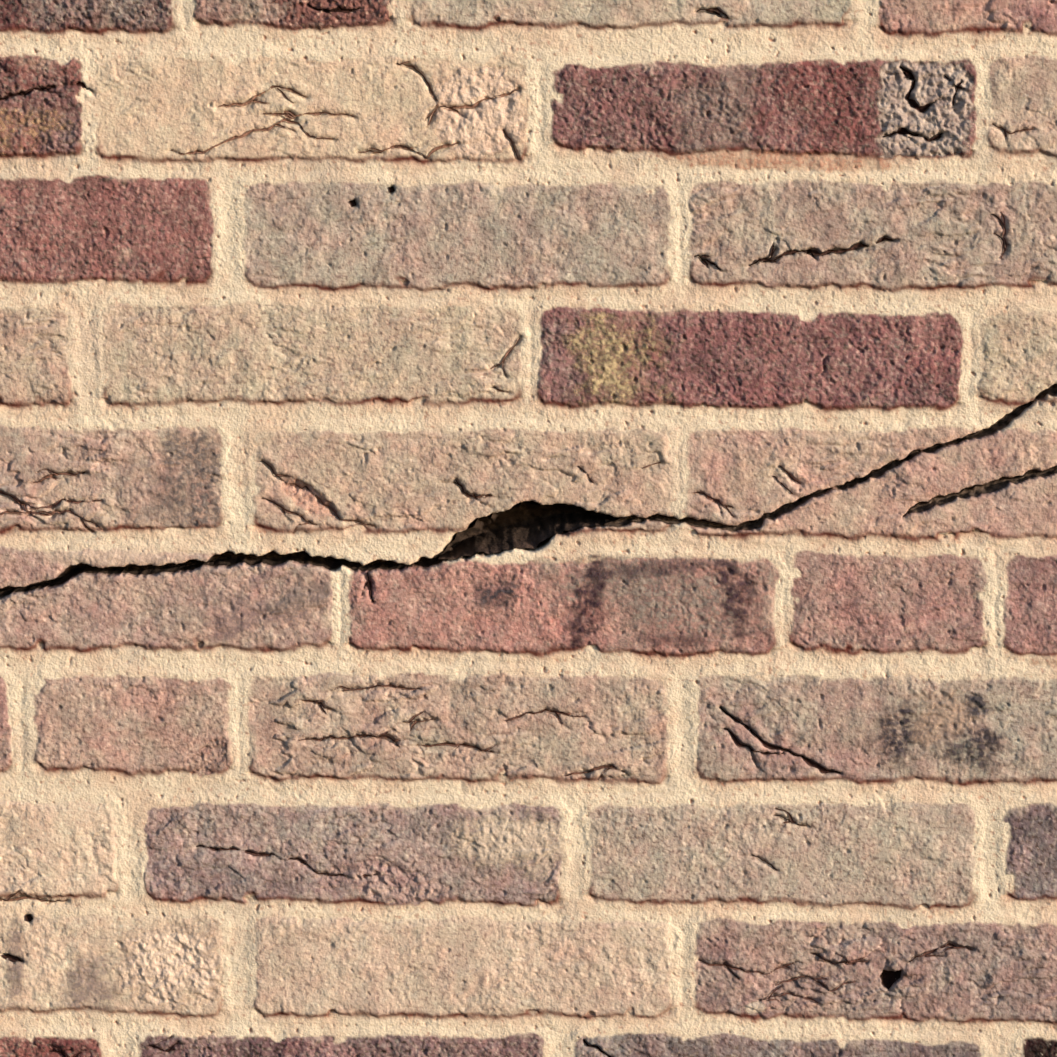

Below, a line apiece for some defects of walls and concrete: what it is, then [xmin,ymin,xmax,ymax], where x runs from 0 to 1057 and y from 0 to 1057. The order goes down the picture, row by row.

crack [490,338,520,393]
crack [0,385,1057,602]